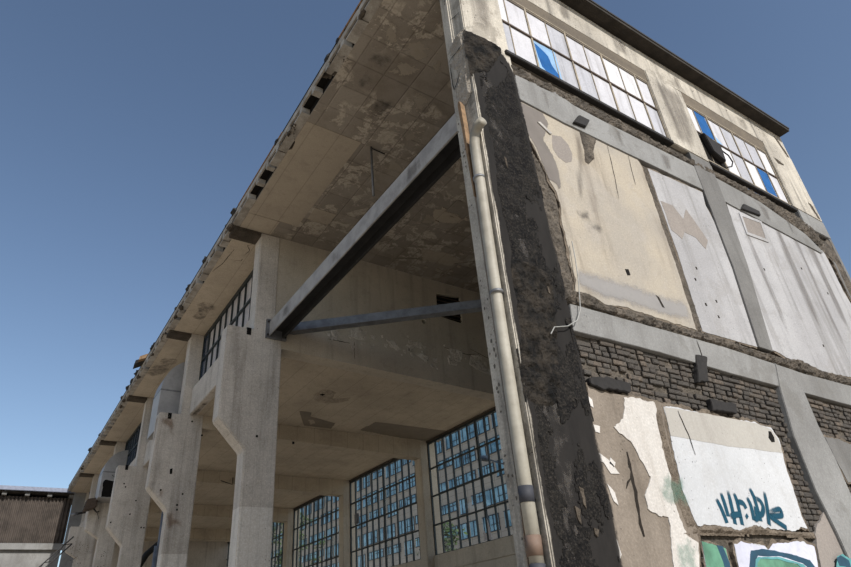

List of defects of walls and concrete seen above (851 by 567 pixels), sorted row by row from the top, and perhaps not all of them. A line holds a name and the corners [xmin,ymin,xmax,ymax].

spalling [450,28,472,106]
spalling [818,240,851,296]
peeling [574,486,586,525]
peeling [600,454,619,474]
crack [626,452,645,537]
peeling [614,397,699,567]